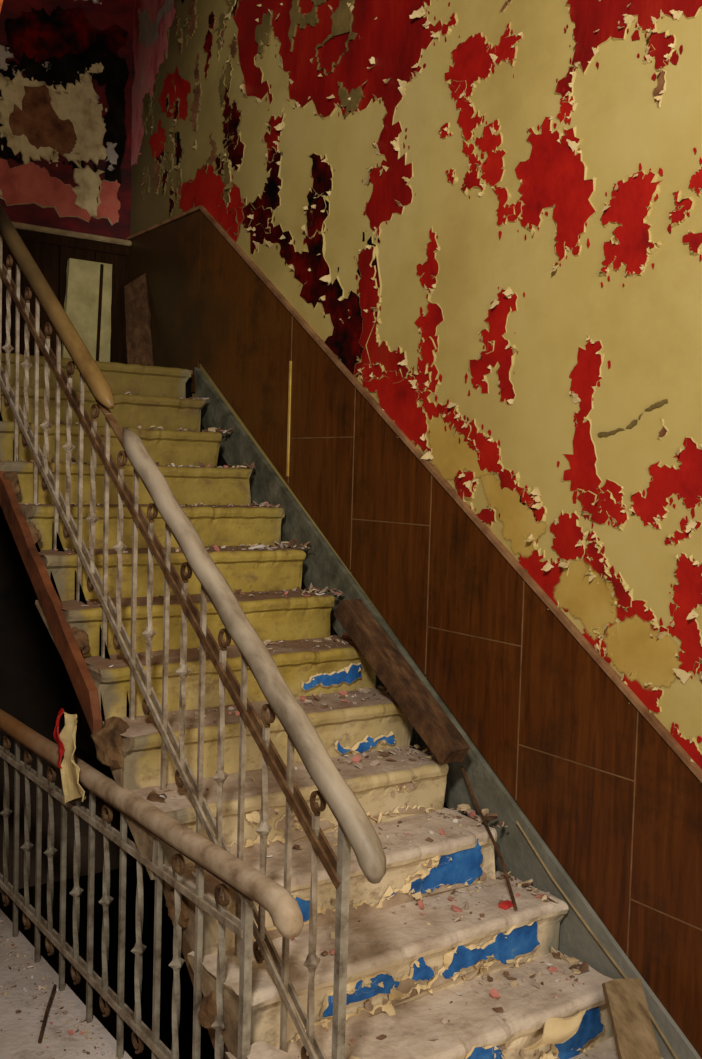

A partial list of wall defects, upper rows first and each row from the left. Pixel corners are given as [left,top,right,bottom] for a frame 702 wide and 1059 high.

flaking render [0,45,120,225]
peeling [140,0,702,684]
peeling [301,663,362,691]
peeling [621,670,664,714]
peeling [335,730,396,755]
peeling [670,722,702,769]
spalling [146,791,167,803]
peeling [349,837,486,919]
peeling [293,894,336,932]
peeling [346,921,540,1025]
peeling [464,1043,507,1059]
peeling [520,1006,605,1059]